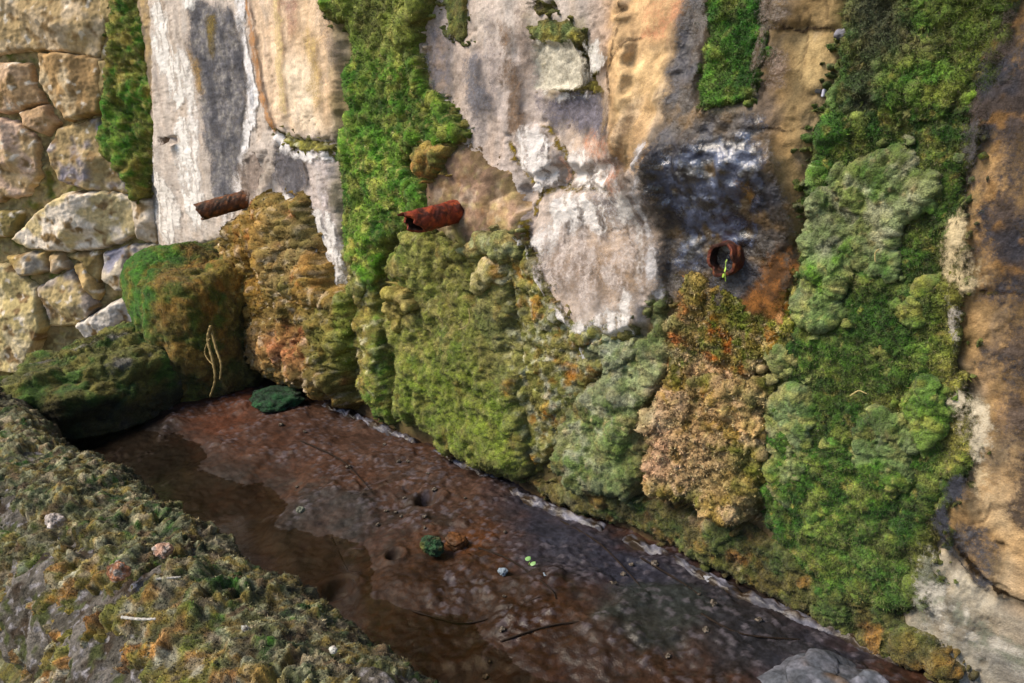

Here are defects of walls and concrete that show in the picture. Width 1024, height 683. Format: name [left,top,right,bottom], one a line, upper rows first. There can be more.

leakage [464,0,798,337]